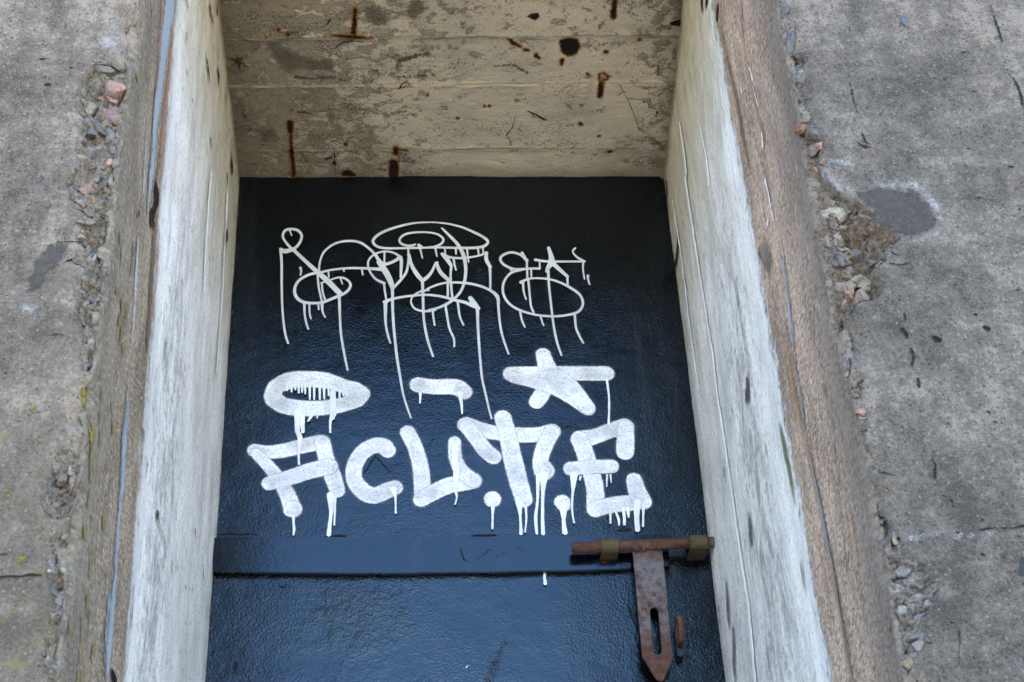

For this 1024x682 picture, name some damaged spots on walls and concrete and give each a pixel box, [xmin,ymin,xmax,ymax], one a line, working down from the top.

corrosion [332,7,373,40]
corrosion [559,37,581,66]
corrosion [585,71,610,99]
corrosion [285,109,297,178]
corrosion [388,145,409,177]